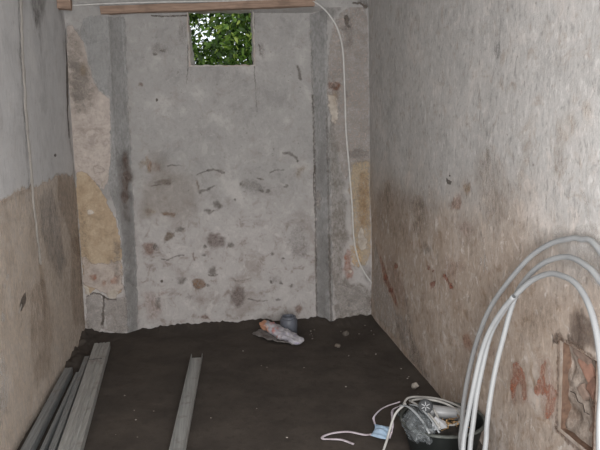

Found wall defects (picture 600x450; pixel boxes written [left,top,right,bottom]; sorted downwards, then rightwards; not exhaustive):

spalling [67,25,124,299]
damp [0,174,85,450]